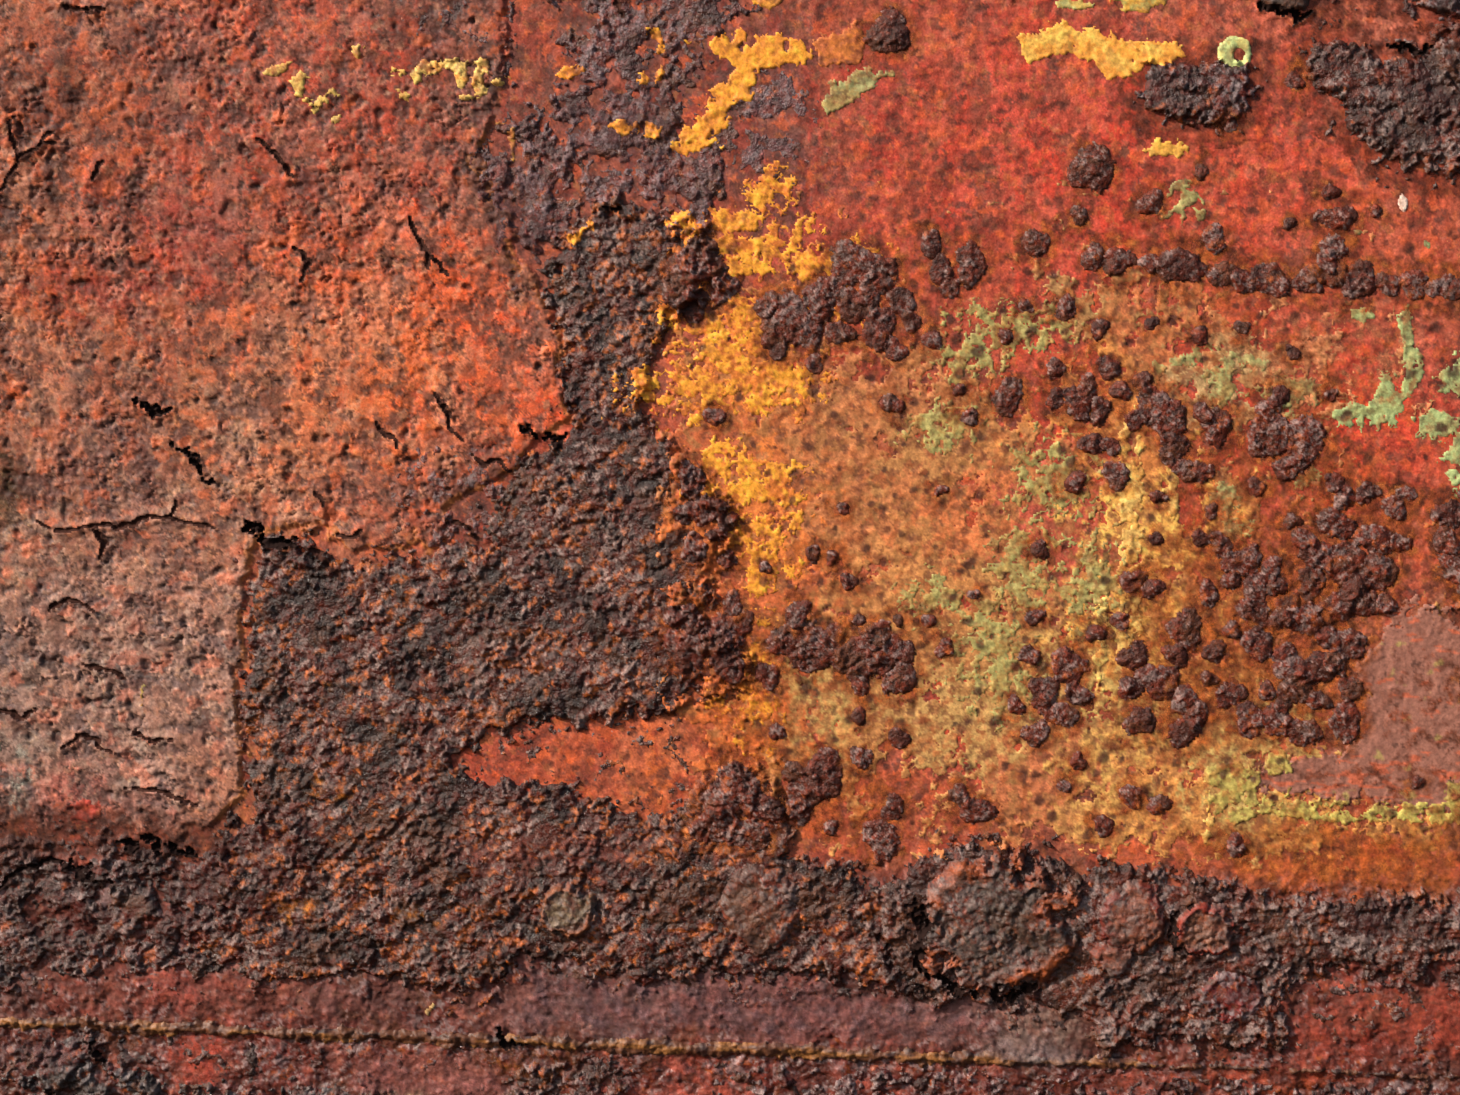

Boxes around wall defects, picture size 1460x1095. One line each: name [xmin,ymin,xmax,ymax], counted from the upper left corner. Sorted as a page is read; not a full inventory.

peeling [752,0,782,11]
crack [0,116,57,192]
peeling [566,220,594,245]
peeling [607,20,895,157]
rust [750,221,995,379]
rust [1009,141,1460,316]
rust [1118,0,1460,198]
crack [47,597,95,613]
crack [36,396,363,580]
peeling [601,160,1460,870]
rust [944,289,1460,799]
crack [0,707,37,721]